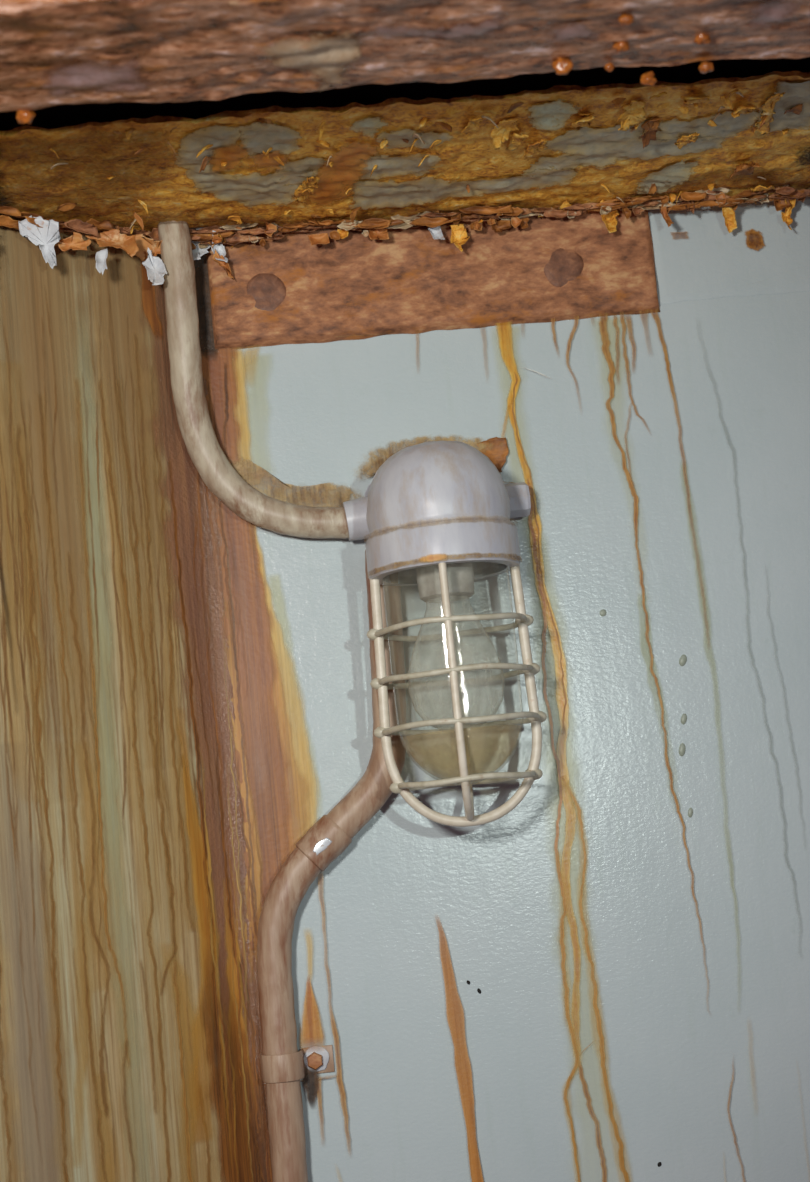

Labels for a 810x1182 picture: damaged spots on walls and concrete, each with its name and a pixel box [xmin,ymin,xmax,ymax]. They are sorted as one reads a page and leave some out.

peeling [18,215,61,269]
peeling [95,249,108,275]
water stain [92,231,157,479]
peeling [142,248,167,285]
peeling [175,122,327,208]
peeling [349,81,810,210]
water stain [0,186,122,888]
rust [54,199,316,1182]
rust [478,316,629,1182]
rust [599,311,704,946]
rust [301,880,350,1143]
rust [437,925,484,1182]